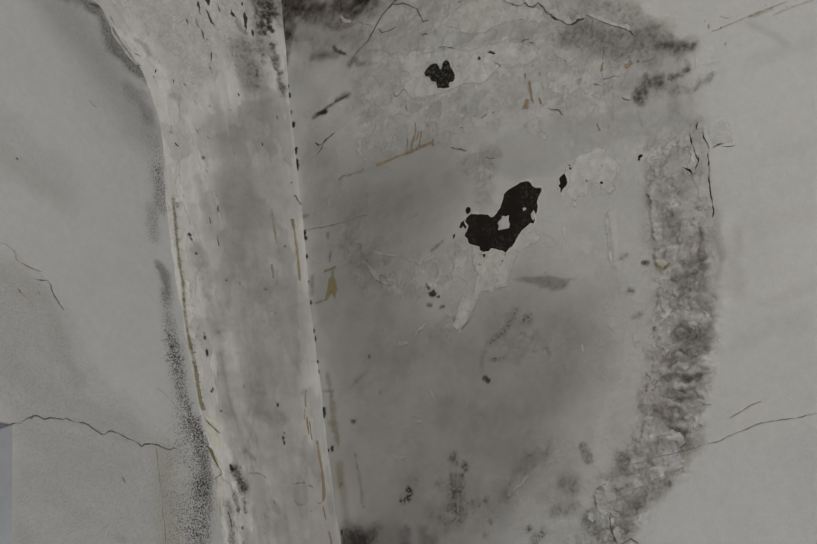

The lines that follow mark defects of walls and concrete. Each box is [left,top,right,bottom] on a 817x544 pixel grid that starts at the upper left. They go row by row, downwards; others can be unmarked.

mould [254,0,368,40]
crack [350,0,453,66]
crack [504,0,635,37]
peeling [400,42,537,97]
mould [634,77,663,103]
peeling [557,148,617,200]
crack [683,122,731,217]
spalling [452,179,544,329]
mould [155,261,214,544]
crack [11,415,179,544]
crack [205,418,222,480]
mould [341,528,367,544]